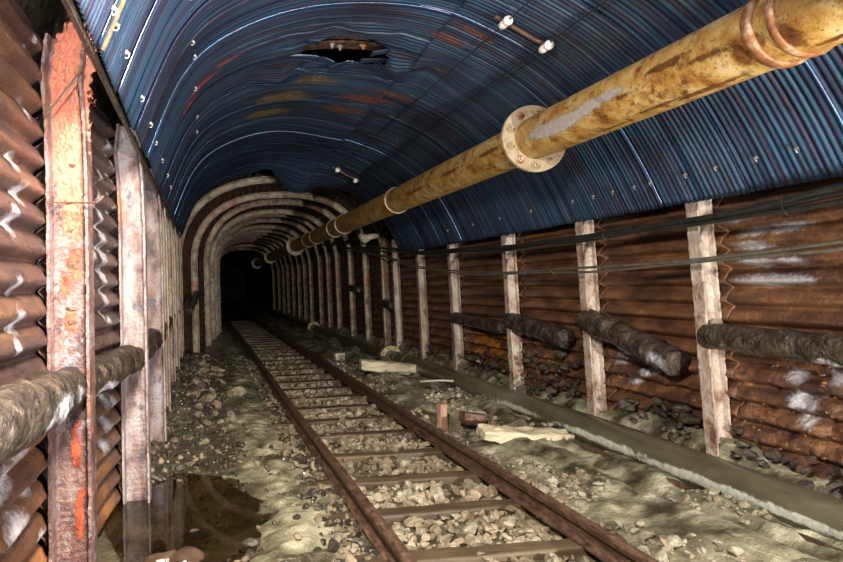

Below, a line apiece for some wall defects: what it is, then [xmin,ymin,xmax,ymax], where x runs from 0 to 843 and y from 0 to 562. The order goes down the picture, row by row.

rust [779,23,806,46]
rust [646,41,752,74]
rust [635,74,748,115]
efflorescence [1,187,20,228]
efflorescence [93,192,115,308]
efflorescence [788,370,806,382]
efflorescence [818,359,843,383]
efflorescence [789,394,816,429]
efflorescence [7,512,26,547]